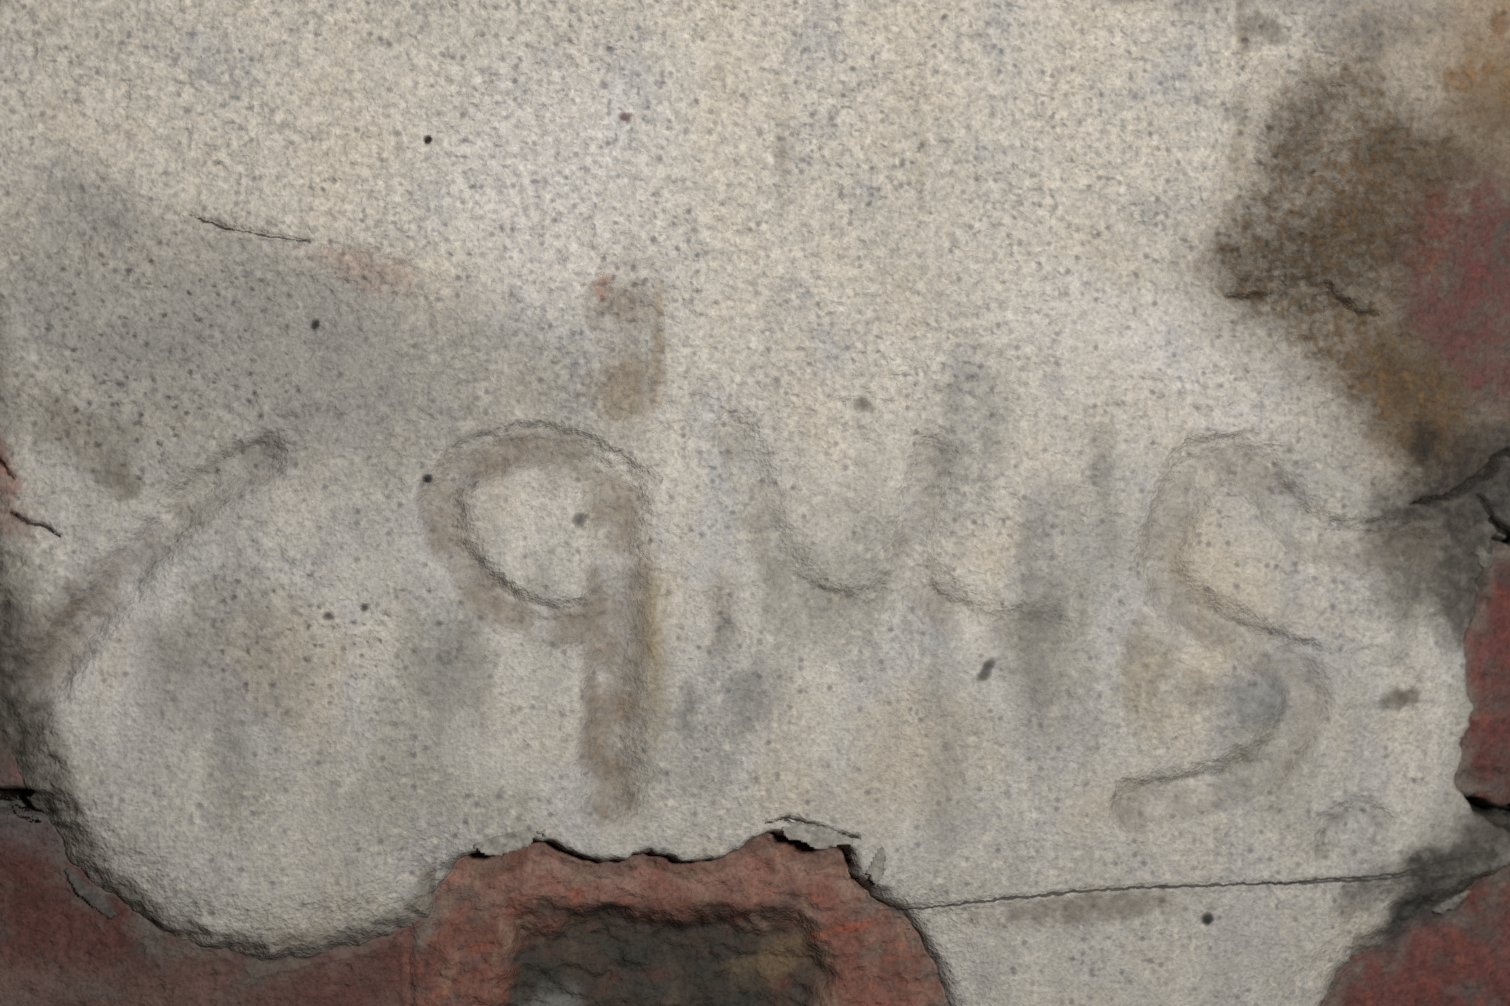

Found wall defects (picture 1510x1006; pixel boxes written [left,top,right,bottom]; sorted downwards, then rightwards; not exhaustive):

leakage [1227,90,1510,530]
crack [1409,449,1510,544]
spalling [1455,541,1510,816]
spalling [0,740,24,790]
spalling [390,821,945,1006]
crack [881,852,1478,911]
spalling [1325,865,1510,1006]